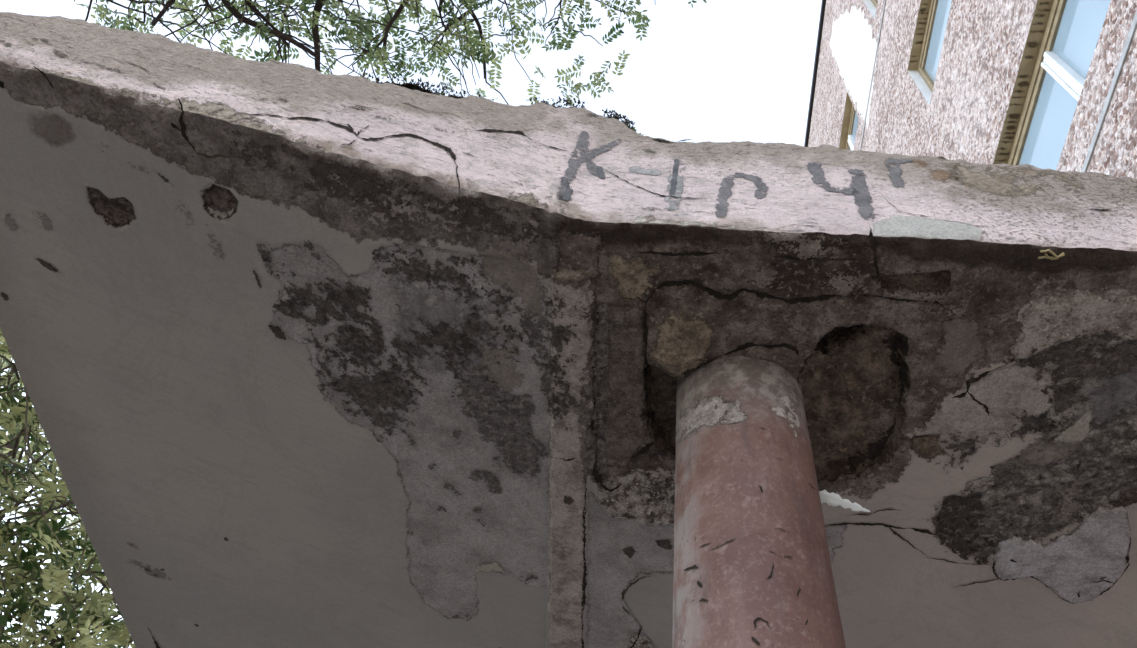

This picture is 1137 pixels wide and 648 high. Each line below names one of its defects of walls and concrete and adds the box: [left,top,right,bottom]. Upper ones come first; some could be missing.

crack [238,102,697,199]
peeling [0,61,601,621]
crack [627,228,963,459]
crack [953,347,1019,416]
crack [561,233,599,648]
spalling [556,214,1137,648]
crack [683,528,792,601]
crack [826,509,998,588]
crack [751,617,770,645]